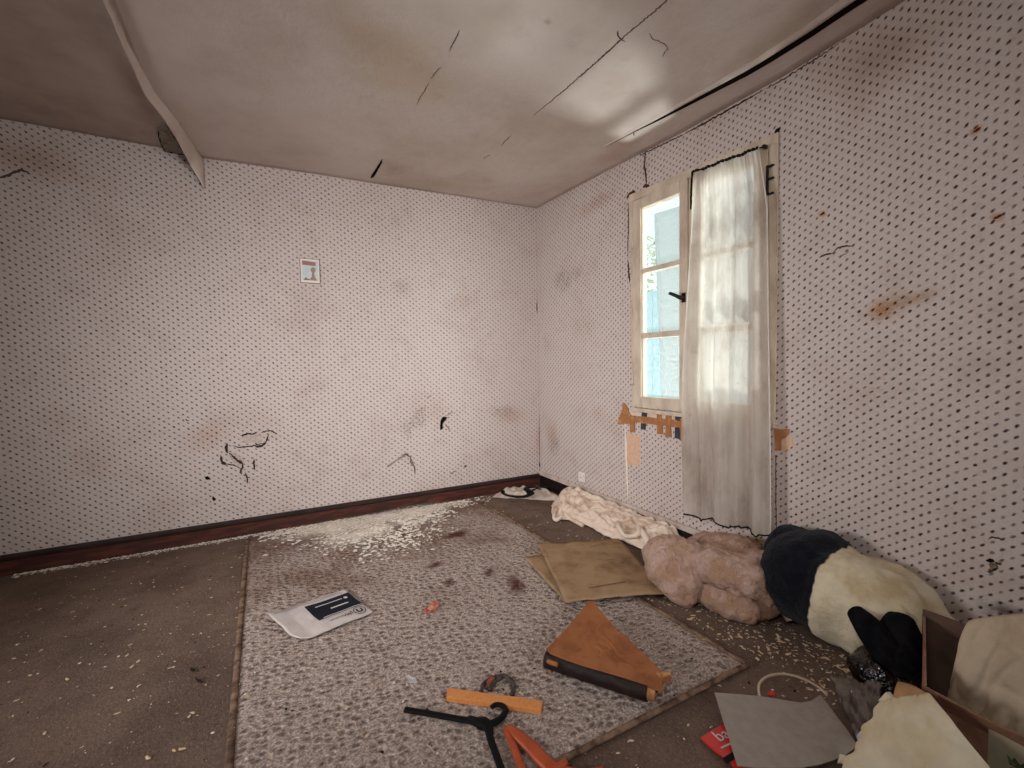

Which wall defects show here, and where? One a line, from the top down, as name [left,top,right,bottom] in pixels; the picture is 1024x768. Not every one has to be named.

crack [535,0,668,114]
crack [0,169,30,178]
crack [627,41,842,196]